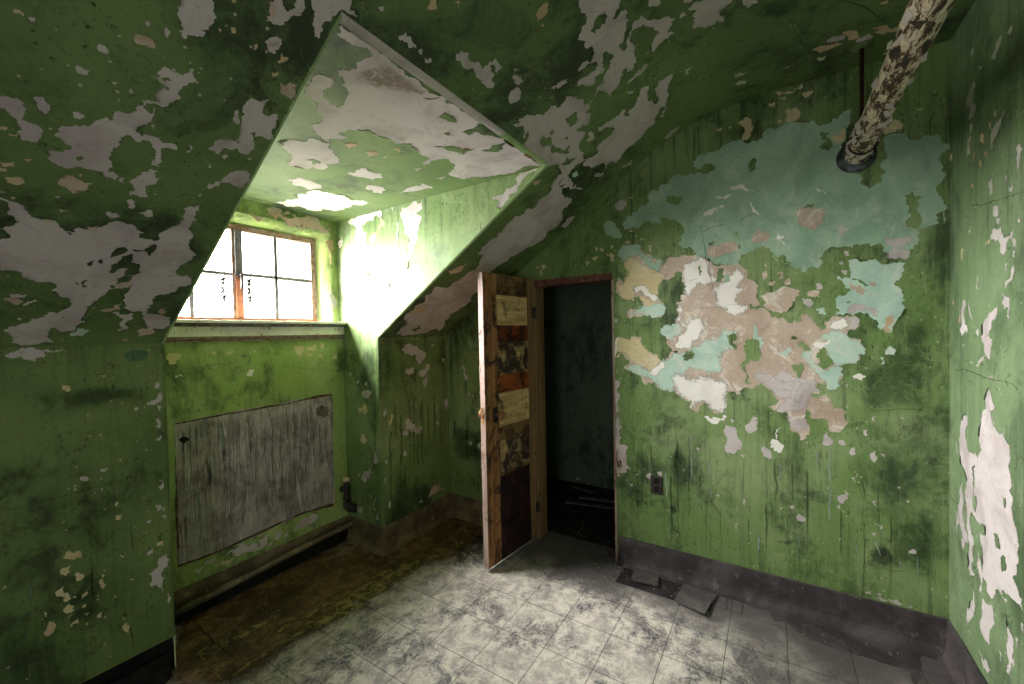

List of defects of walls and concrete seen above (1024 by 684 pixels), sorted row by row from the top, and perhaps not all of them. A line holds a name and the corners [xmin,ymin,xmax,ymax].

peeling [0,0,758,387]
peeling [576,84,952,487]
peeling [952,144,1023,367]
peeling [44,612,56,636]
peeling [55,551,106,627]
peeling [615,567,682,600]
damp [665,435,712,522]
peeling [956,375,1024,675]